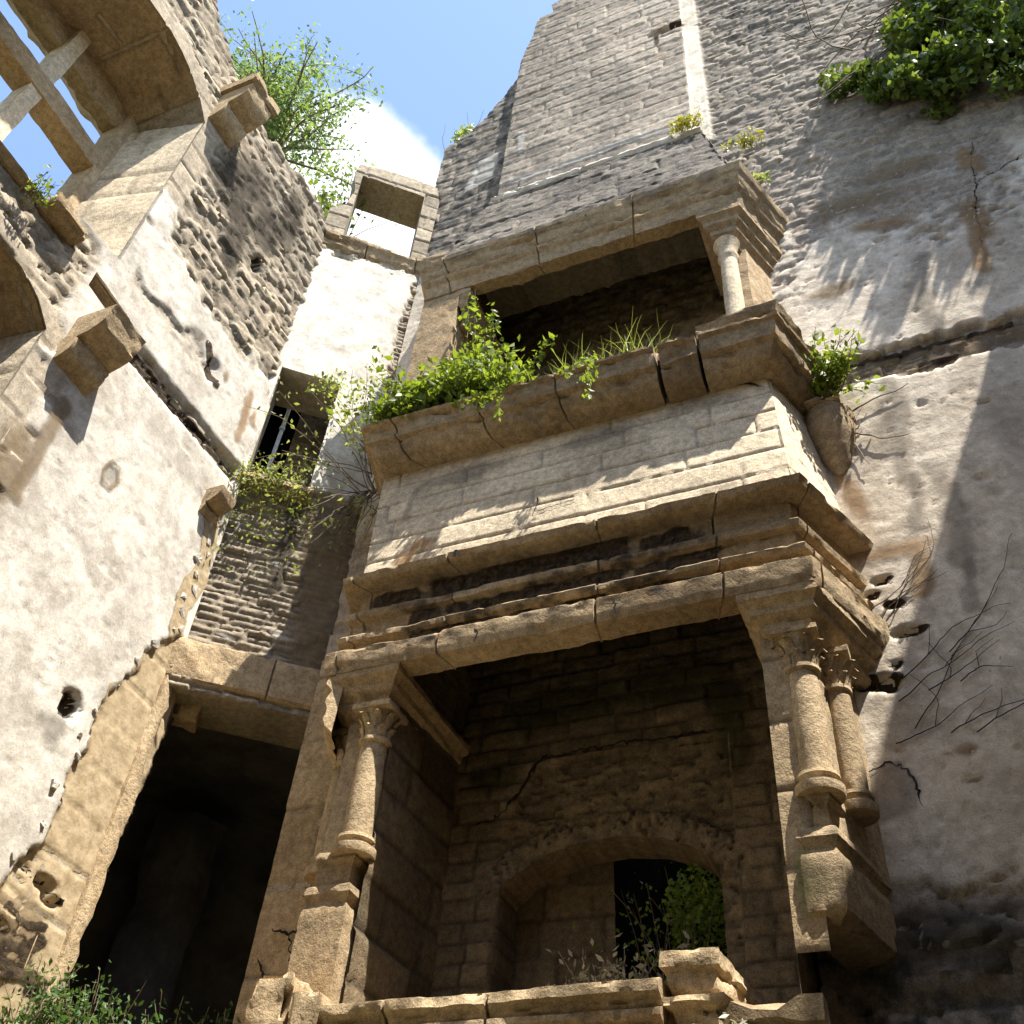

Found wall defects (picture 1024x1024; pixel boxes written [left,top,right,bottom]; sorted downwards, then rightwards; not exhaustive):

crack [970,140,1021,240]
spalling [857,660,904,693]
spalling [867,575,906,609]
spalling [899,624,929,638]
flaking render [0,515,226,1024]
crack [470,728,718,828]